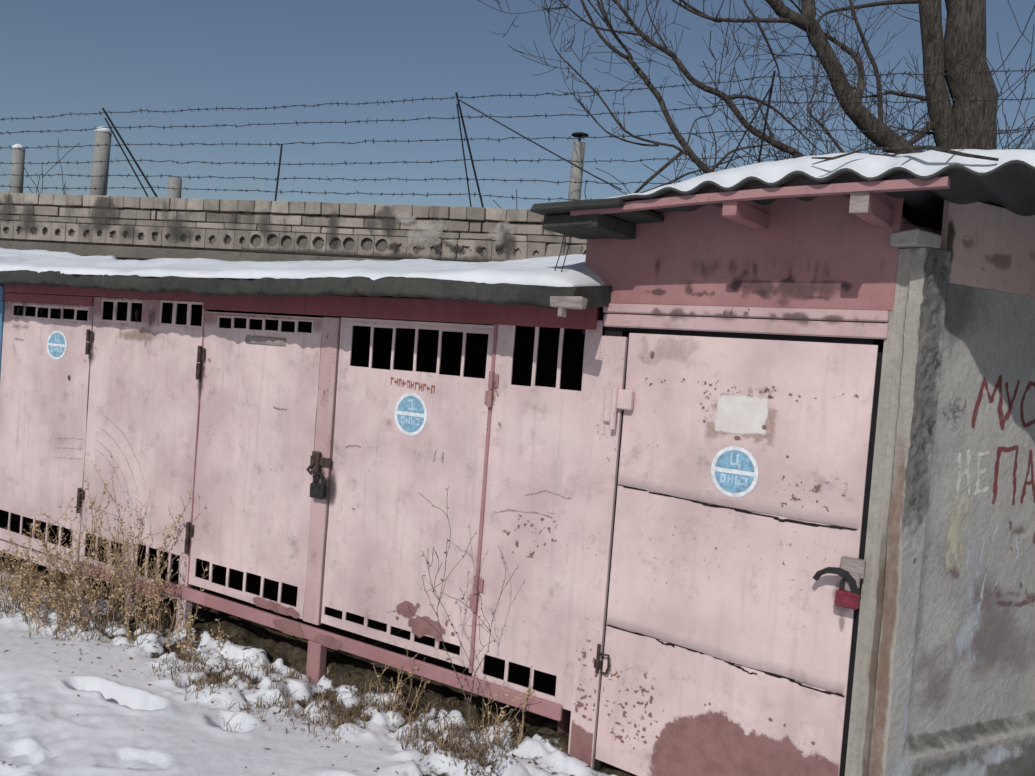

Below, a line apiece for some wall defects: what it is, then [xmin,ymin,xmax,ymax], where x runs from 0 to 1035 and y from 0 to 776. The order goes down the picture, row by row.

rust [698,381,776,423]
crack [618,484,857,531]
rust [781,476,829,512]
rust [503,512,557,558]
peeling [396,601,455,642]
crack [607,625,845,697]
rust [574,640,655,744]
peeling [633,702,839,776]